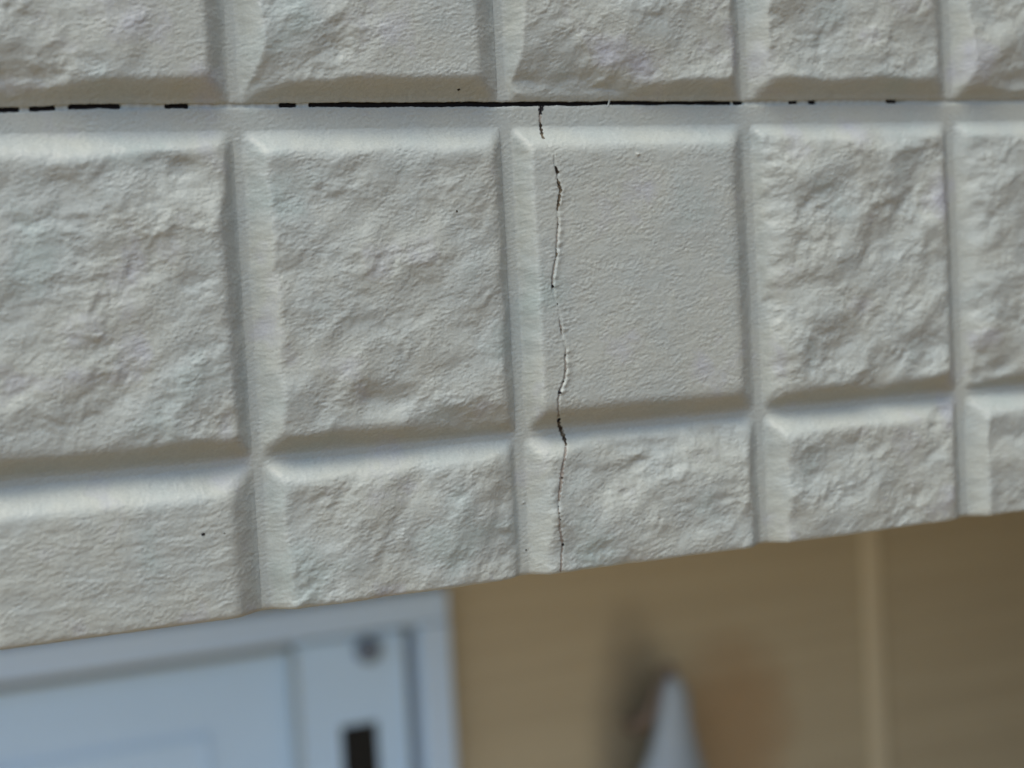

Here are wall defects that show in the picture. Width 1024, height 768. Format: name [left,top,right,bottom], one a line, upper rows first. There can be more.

crack [537,106,545,139]
crack [551,166,567,572]